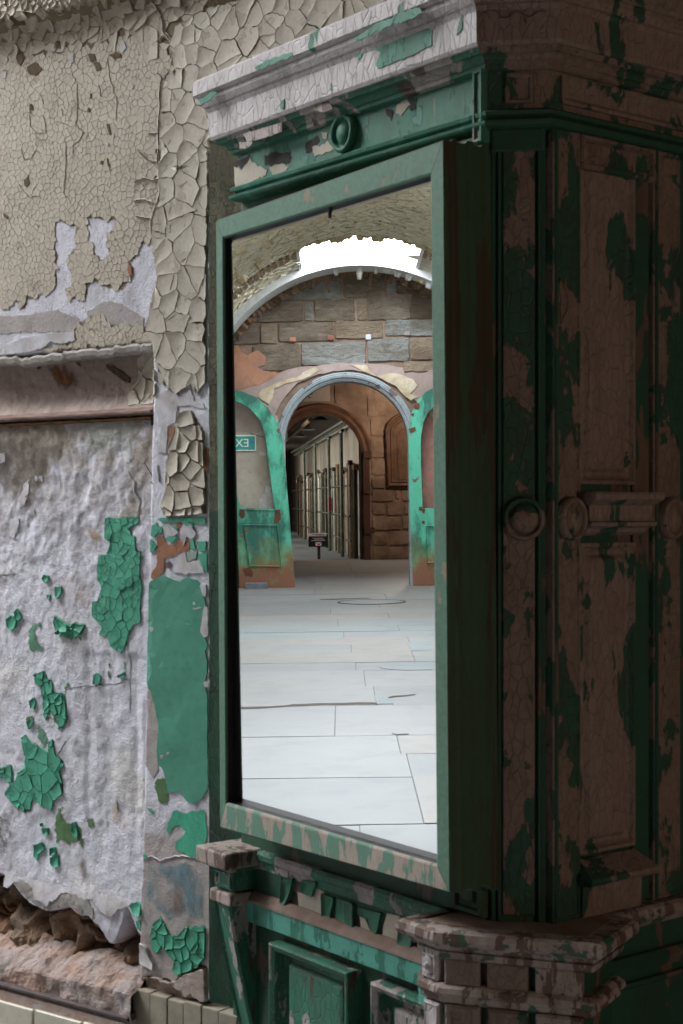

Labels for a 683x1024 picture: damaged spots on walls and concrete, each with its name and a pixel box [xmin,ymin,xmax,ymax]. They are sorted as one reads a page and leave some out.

crack [21,59,117,201]
crack [132,5,210,341]
peeling [0,0,387,653]
peeling [0,671,68,812]
spalling [146,686,169,779]
peeling [33,823,60,868]
peeling [71,822,79,839]
peeling [167,810,207,857]
flaking render [0,873,209,1002]